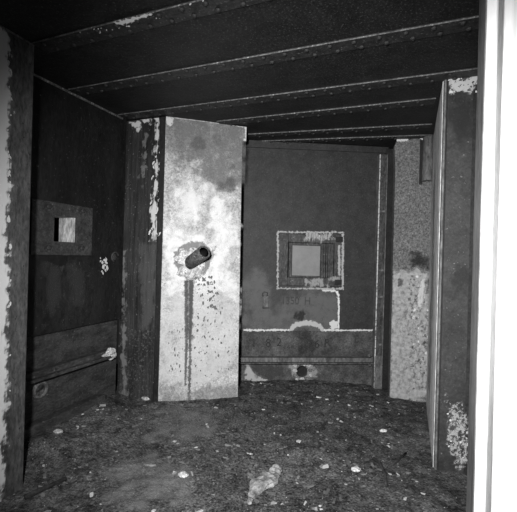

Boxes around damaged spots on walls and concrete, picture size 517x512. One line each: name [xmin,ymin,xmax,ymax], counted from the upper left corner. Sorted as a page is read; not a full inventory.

peeling [114,13,160,29]
peeling [448,76,477,105]
peeling [129,118,161,242]
peeling [0,27,12,502]
rust [173,241,212,400]
peeling [243,154,381,375]
leakage [411,174,435,392]
peeling [447,401,468,470]